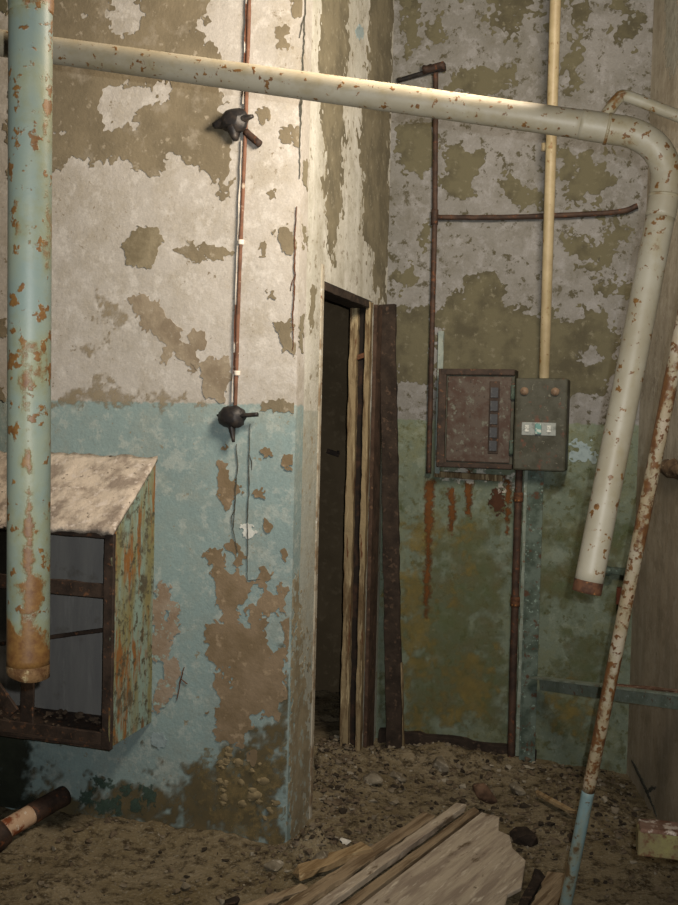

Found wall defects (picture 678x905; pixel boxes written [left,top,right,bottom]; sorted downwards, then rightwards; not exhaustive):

peeling [53,0,222,60]
peeling [315,0,353,77]
peeling [362,0,449,83]
peeling [442,61,519,96]
peeling [52,64,236,201]
peeling [121,225,235,269]
peeling [319,103,636,398]
peeling [127,292,232,403]
peeling [273,284,317,356]
corrosion [423,468,474,618]
corrosion [488,475,512,534]
peeling [201,539,312,839]